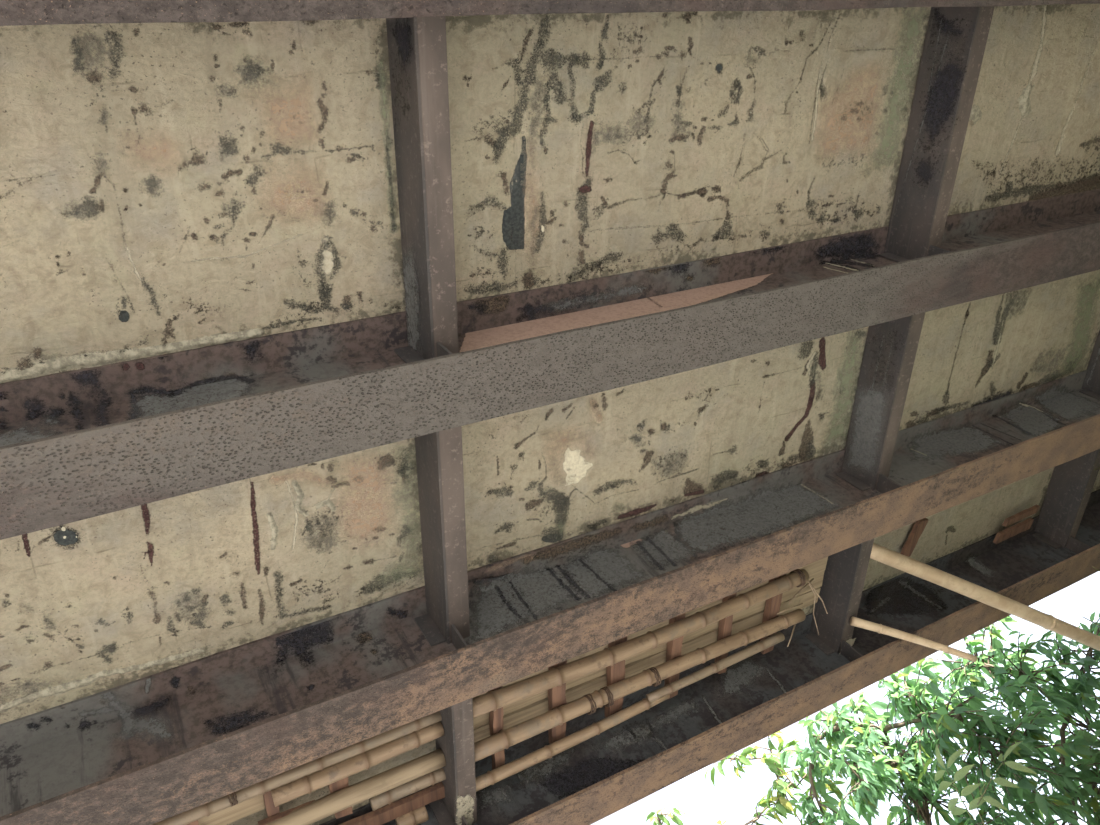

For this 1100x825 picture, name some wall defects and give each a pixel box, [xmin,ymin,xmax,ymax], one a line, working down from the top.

damp [71,27,139,127]
mould [197,126,373,246]
rust [582,121,598,176]
mould [472,15,723,163]
damp [972,5,1100,202]
damp [464,179,643,294]
damp [653,220,770,253]
damp [118,297,132,322]
spalling [563,447,593,486]
rust [141,504,154,574]
rust [250,482,261,575]
damp [264,453,422,674]